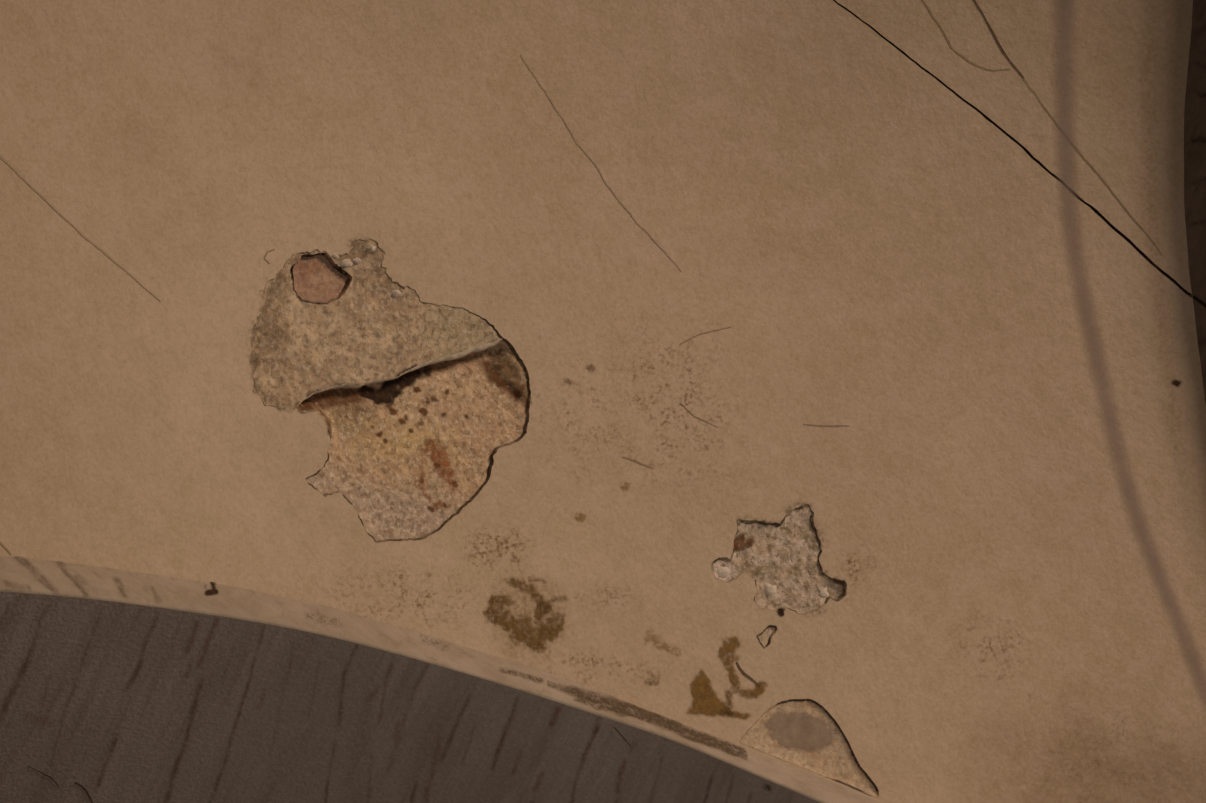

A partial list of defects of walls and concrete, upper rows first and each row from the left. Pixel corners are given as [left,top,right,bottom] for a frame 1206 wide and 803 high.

crack [833,0,1206,307]
spalling [249,238,531,542]
water stain [484,579,566,652]
spalling [712,503,847,648]
water stain [502,637,766,756]
peeling [739,699,879,798]